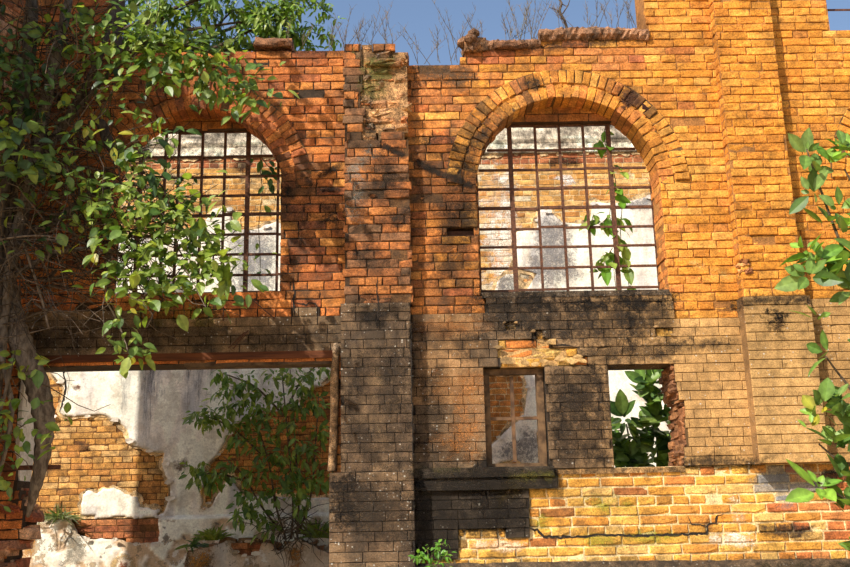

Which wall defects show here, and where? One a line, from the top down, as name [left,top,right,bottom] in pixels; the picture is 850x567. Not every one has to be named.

mould [730,295,810,330]
leakage [329,172,735,563]
flaking render [489,321,588,442]
peeling [36,376,176,546]
leakage [64,536,85,564]
leakage [110,554,135,567]
crack [530,514,723,546]
leakage [711,533,754,546]